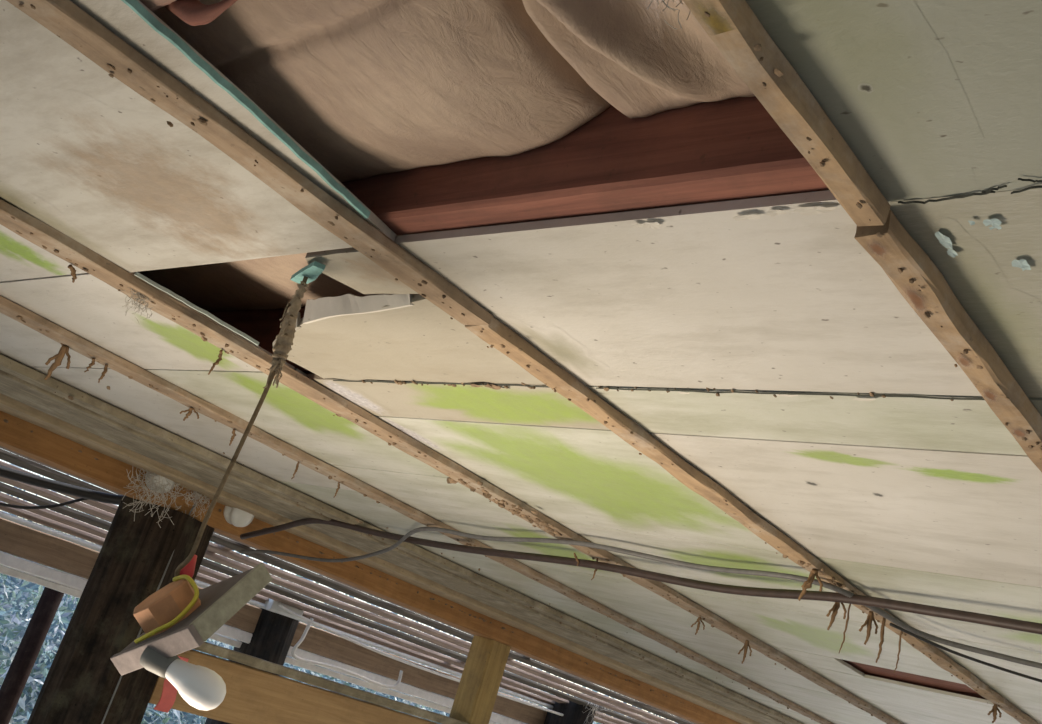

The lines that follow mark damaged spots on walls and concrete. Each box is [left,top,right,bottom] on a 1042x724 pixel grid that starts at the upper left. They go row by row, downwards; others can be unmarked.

spalling [121,0,371,219]
crack [898,178,1042,204]